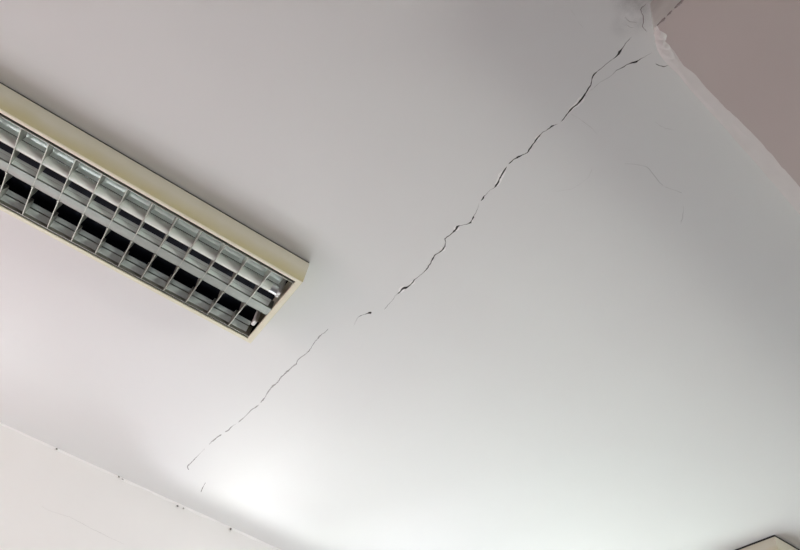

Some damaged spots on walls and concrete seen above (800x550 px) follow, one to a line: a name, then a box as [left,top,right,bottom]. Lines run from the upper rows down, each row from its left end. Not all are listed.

crack [359,0,684,317]
crack [187,329,328,470]